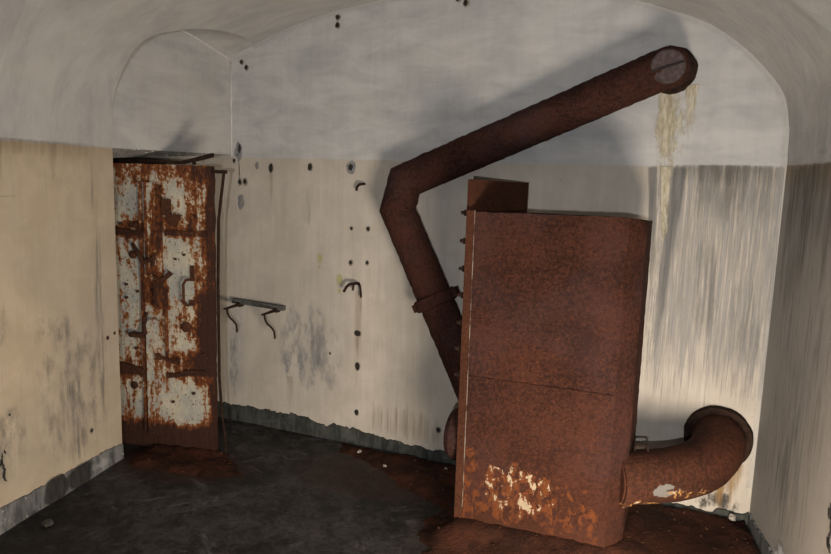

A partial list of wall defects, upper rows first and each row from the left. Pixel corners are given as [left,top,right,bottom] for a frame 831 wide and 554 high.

leakage [647,84,785,385]
leakage [700,494,736,509]